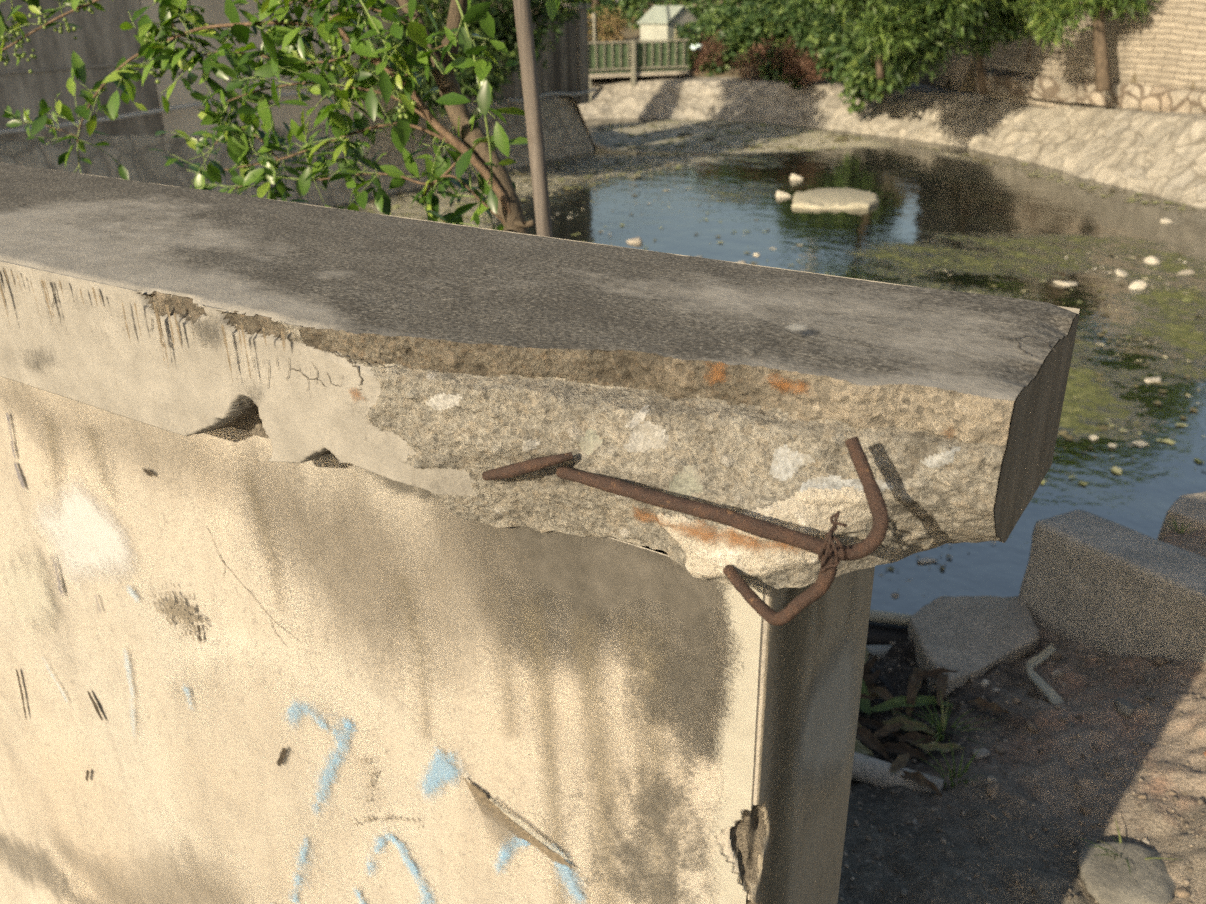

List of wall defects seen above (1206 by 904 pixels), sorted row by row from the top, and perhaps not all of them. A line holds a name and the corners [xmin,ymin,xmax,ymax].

peeling [141,291,303,343]
spalling [334,351,1006,590]
corrosion [681,526,759,547]
damp [248,481,744,774]
damp [592,755,711,904]
peeling [730,805,767,904]